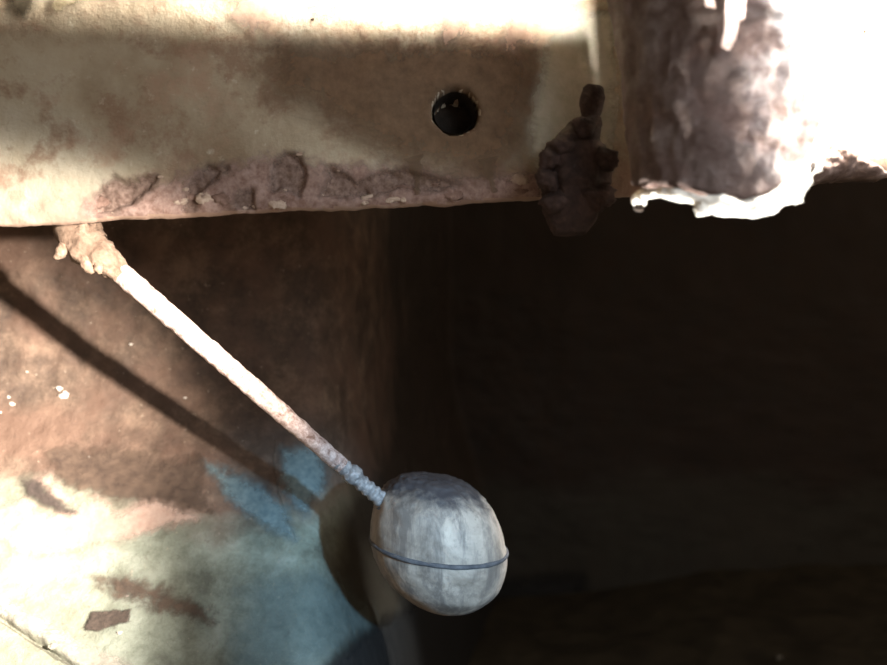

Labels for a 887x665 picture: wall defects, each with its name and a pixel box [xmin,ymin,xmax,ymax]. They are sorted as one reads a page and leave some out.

peeling [705,0,746,50]
crack [0,595,126,665]